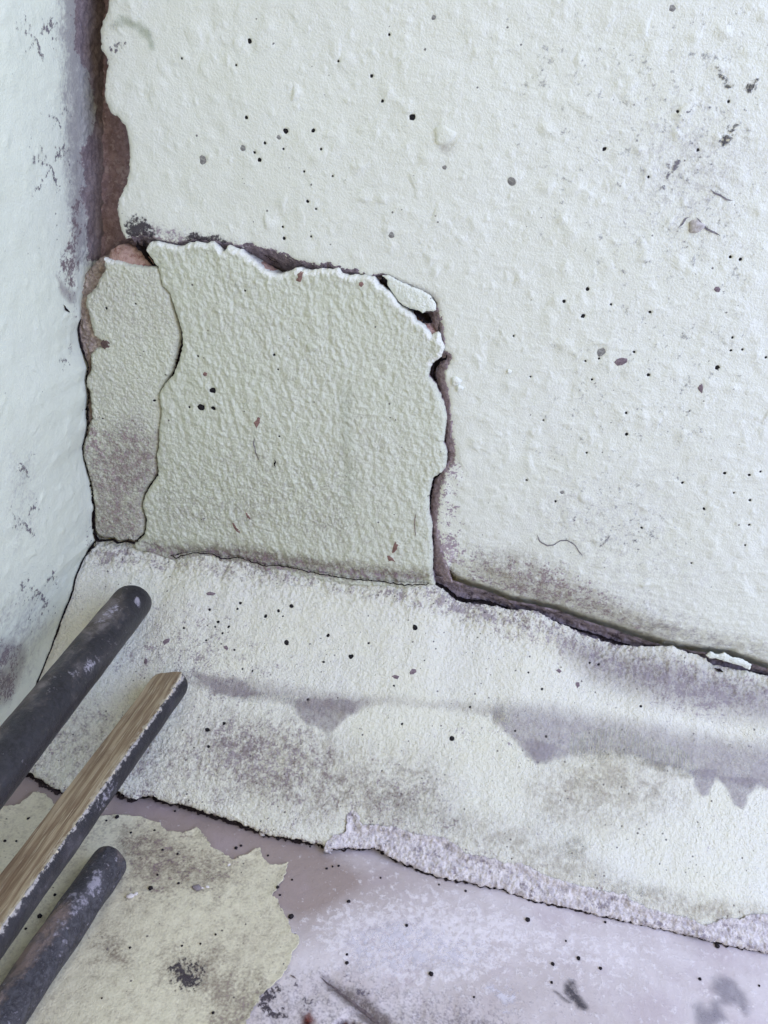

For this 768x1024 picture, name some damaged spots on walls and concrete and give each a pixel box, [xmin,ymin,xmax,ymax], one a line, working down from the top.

flaking render [80,52,456,583]
crack [171,431,768,676]
peeling [0,792,54,874]
peeling [0,814,300,1024]
spalling [323,810,768,954]
damp [499,717,768,807]